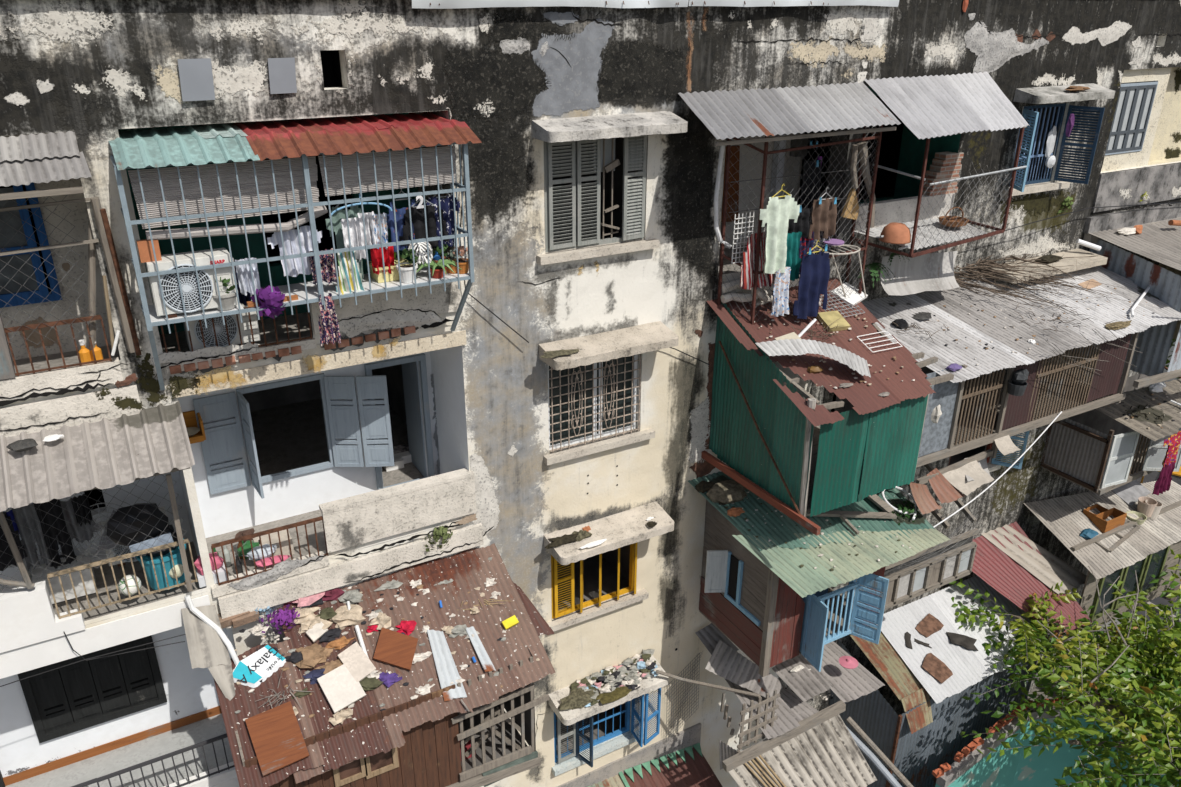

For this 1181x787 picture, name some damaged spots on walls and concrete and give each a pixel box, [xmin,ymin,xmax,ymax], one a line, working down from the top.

water stain [598,38,685,109]
spalling [924,13,1181,88]
water stain [444,12,575,231]
water stain [661,113,719,277]
crack [0,347,256,431]
water stain [659,358,704,565]
water stain [660,578,677,621]